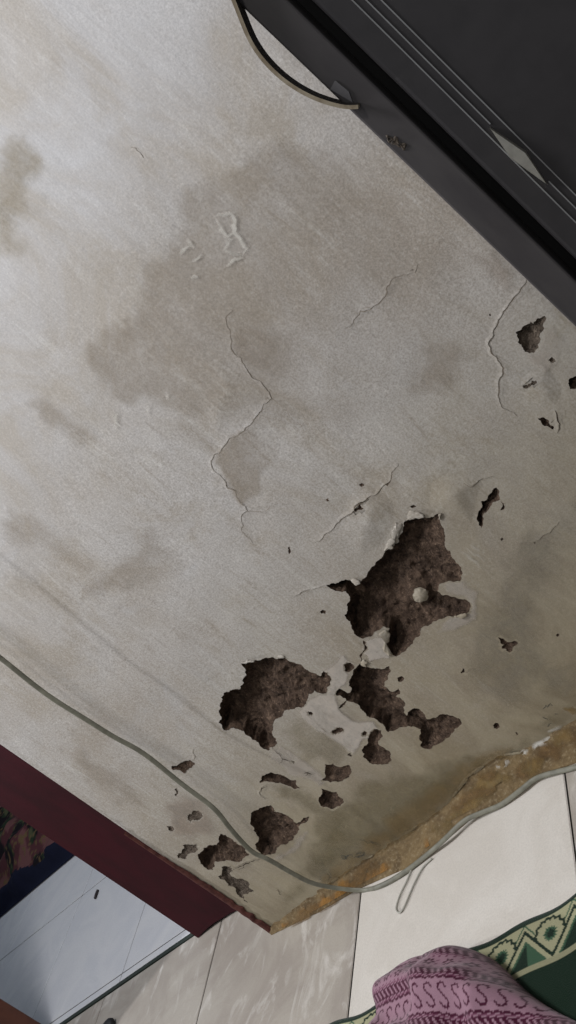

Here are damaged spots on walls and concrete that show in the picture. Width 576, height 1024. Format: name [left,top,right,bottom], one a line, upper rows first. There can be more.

crack [484,279,527,418]
spalling [516,316,546,354]
crack [208,307,306,544]
crack [551,410,560,433]
crack [312,463,399,543]
spalling [477,488,505,528]
spalling [219,505,471,809]
spalling [177,805,309,902]
rust [282,863,388,928]